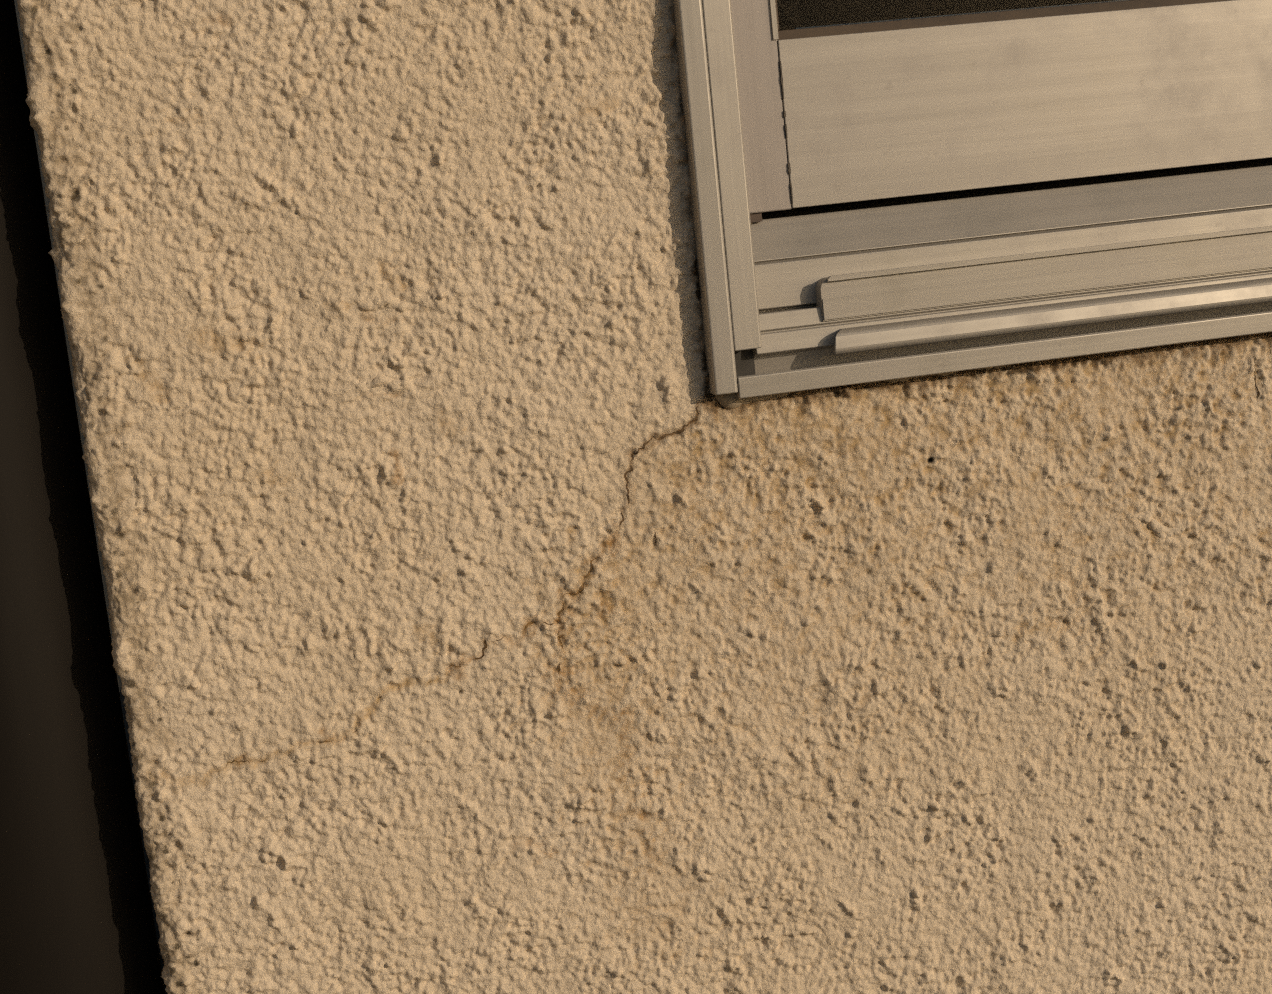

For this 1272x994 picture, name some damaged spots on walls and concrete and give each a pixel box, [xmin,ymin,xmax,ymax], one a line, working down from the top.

crack [378,401,705,700]